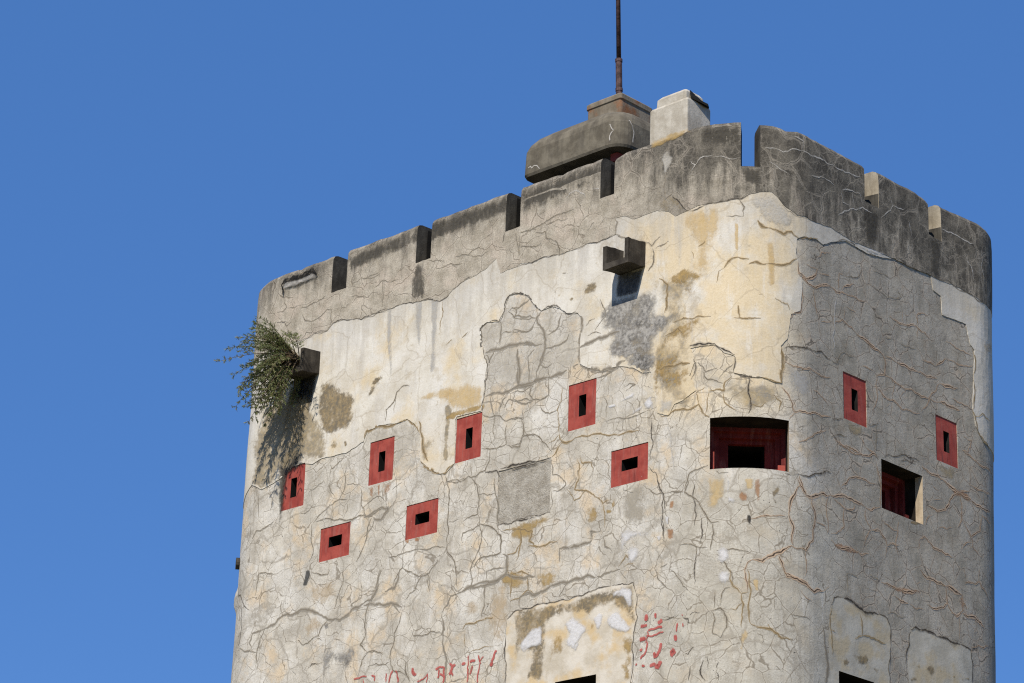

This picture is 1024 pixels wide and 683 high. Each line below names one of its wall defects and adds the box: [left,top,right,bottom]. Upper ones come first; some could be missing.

damp [602,270,679,373]
damp [253,375,354,514]
crack [237,188,992,683]
damp [516,588,633,679]